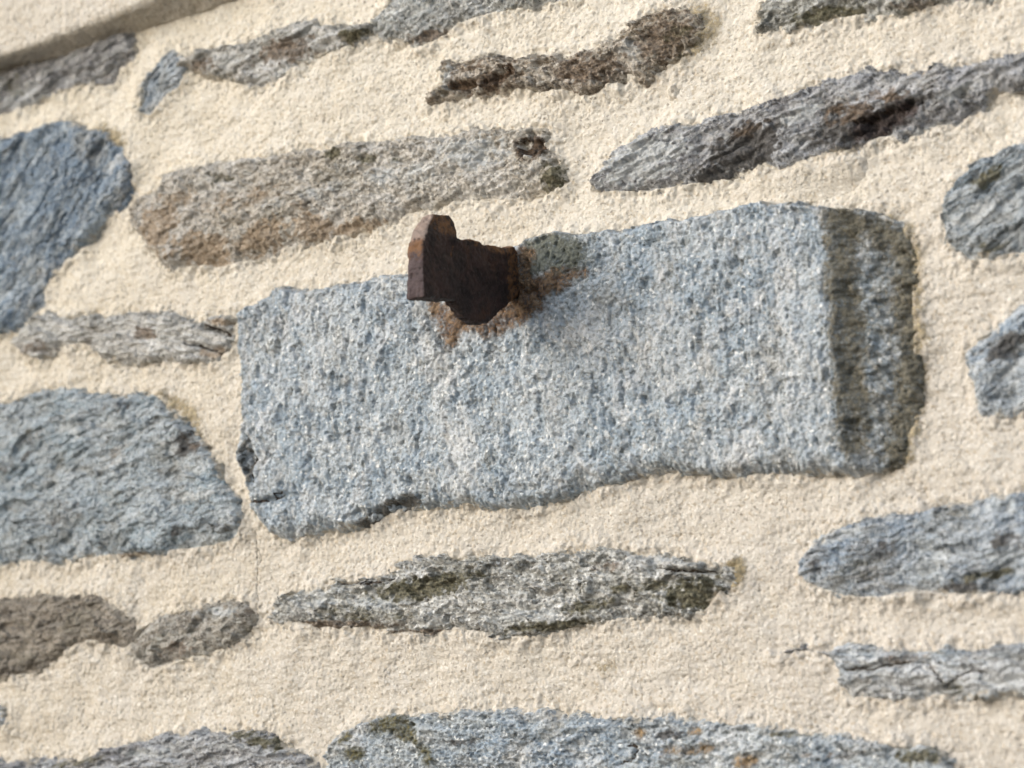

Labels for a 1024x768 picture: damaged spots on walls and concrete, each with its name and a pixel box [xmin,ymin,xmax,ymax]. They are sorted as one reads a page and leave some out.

corrosion [428,245,589,347]